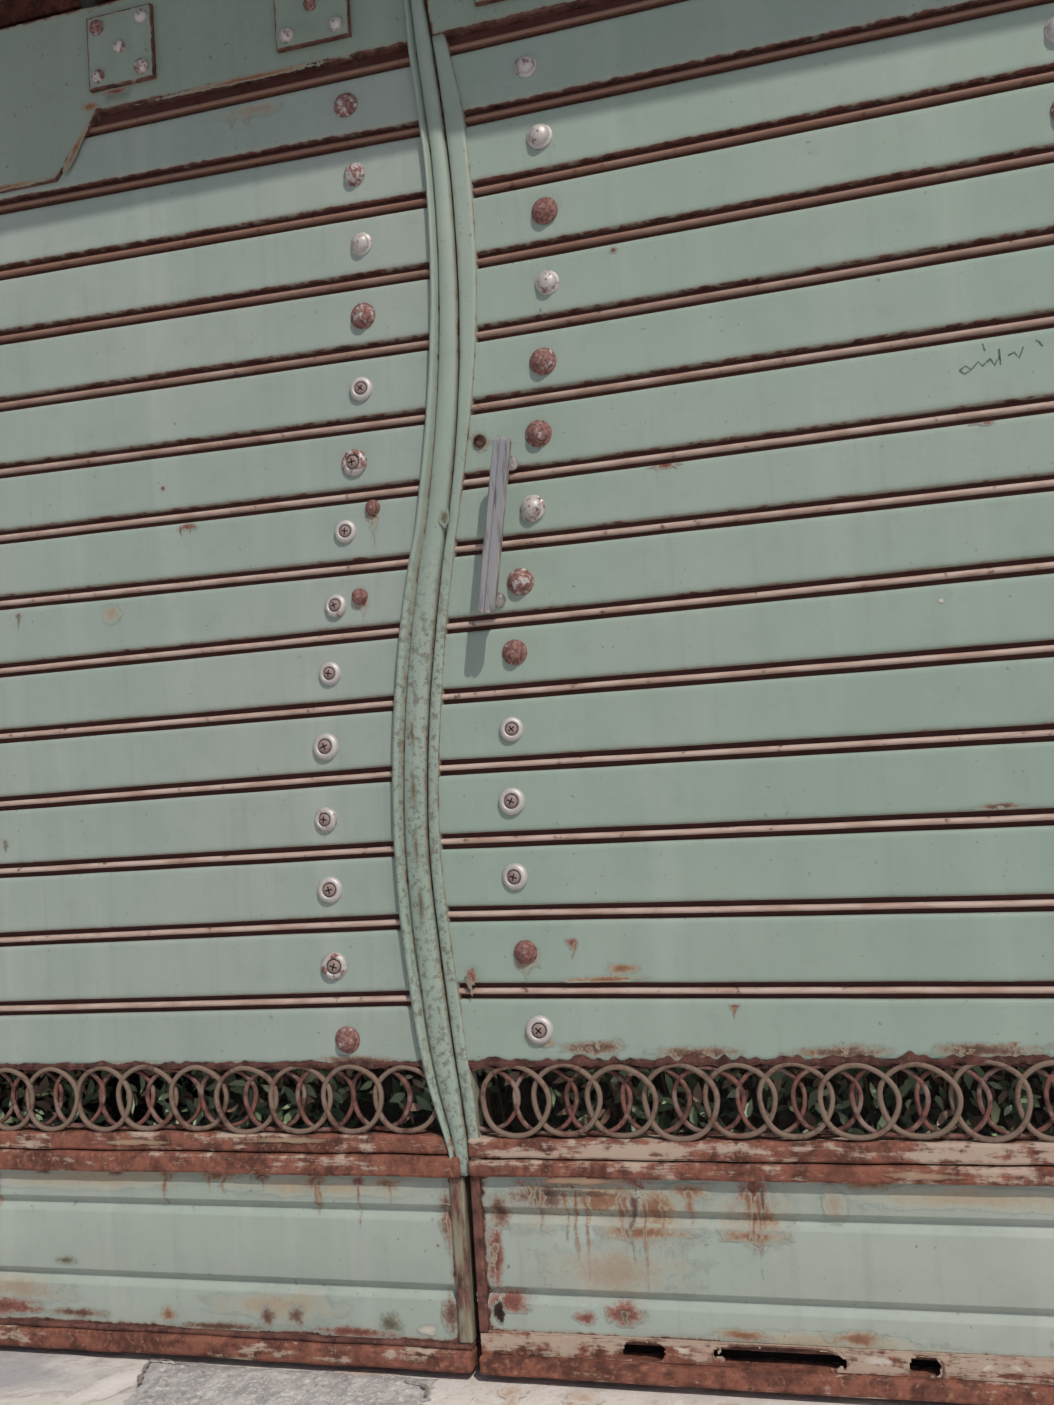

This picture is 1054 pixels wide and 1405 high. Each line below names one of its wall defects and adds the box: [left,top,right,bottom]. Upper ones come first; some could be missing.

rust [328,1368,412,1379]